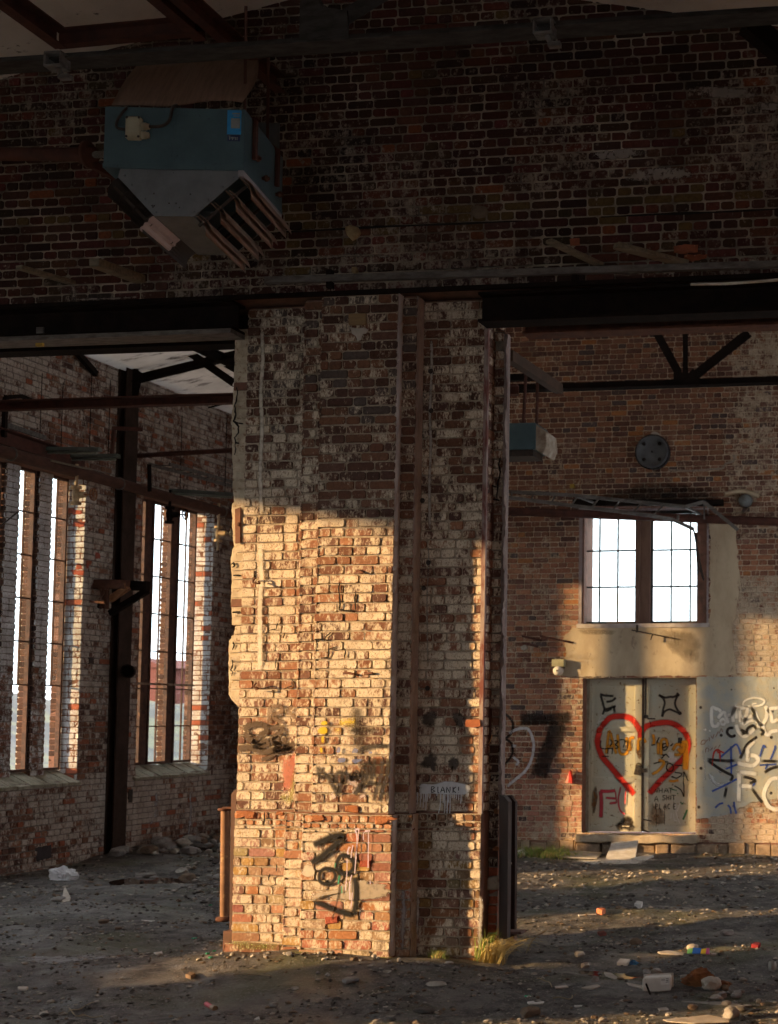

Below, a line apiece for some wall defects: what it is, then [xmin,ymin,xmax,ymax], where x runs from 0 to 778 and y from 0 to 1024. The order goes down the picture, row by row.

crack [233,387,243,455]